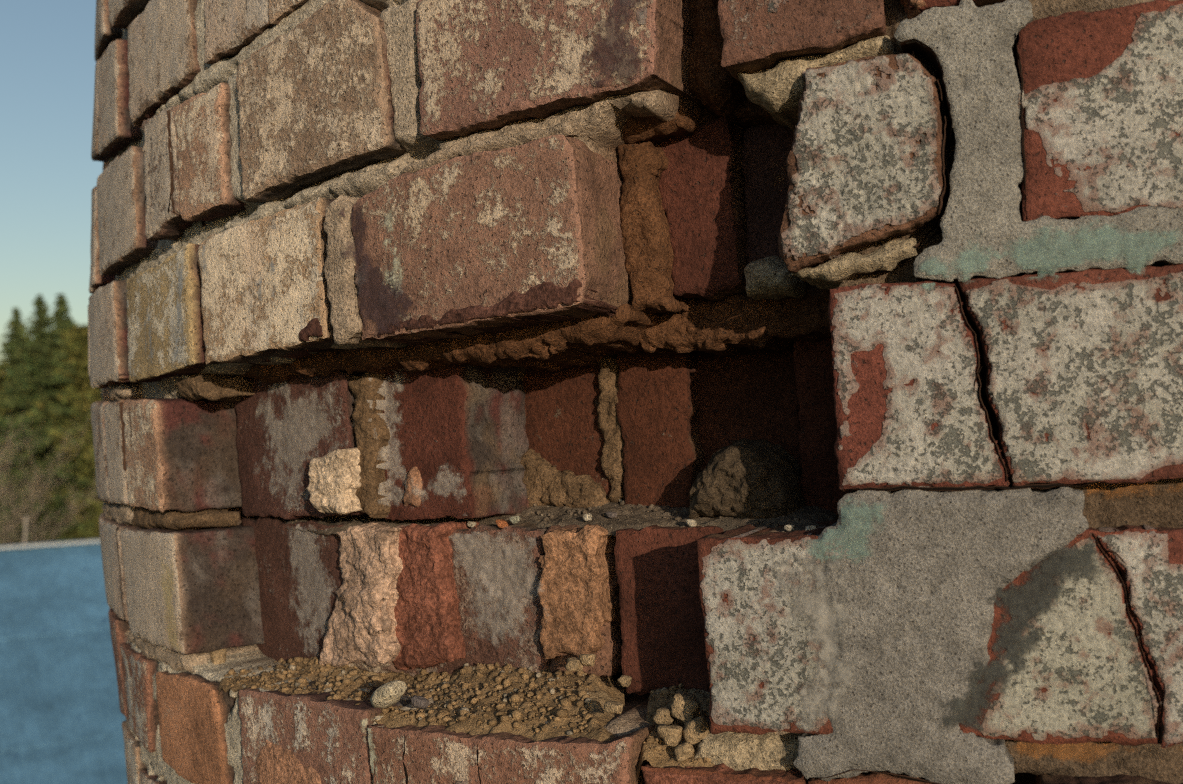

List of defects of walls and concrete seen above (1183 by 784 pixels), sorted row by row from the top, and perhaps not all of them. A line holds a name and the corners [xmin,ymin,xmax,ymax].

peeling [781,51,941,265]
peeling [1018,3,1183,213]
crack [848,278,1090,491]
peeling [832,271,1183,486]
spalling [306,447,480,671]
spalling [537,524,621,660]
crack [1093,533,1164,744]
crack [401,736,409,784]
spalling [642,763,802,784]
crack [807,769,941,784]